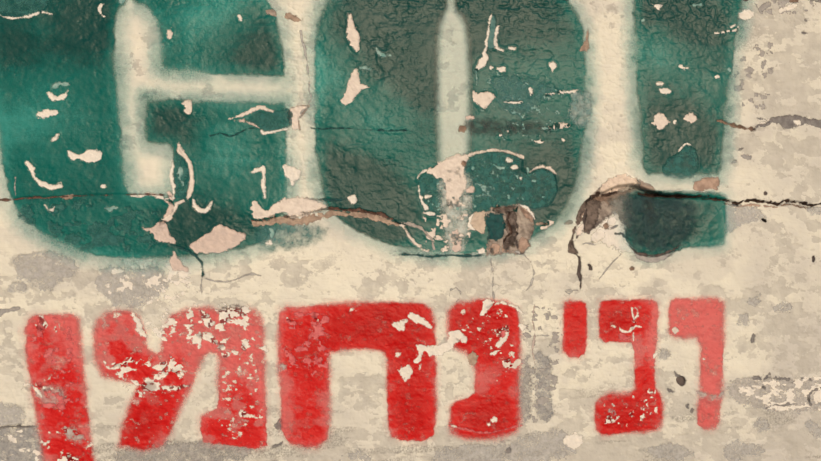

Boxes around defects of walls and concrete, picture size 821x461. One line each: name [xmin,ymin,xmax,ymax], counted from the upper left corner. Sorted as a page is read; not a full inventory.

peeling [340,66,371,105]
peeling [458,14,592,144]
crack [717,118,771,131]
crack [0,177,81,202]
peeling [22,143,269,461]
crack [170,244,261,293]
crack [250,195,495,299]
peeling [417,148,558,256]
crack [564,198,621,294]
spalling [575,143,720,271]
crack [702,197,821,208]
peeling [392,299,576,461]